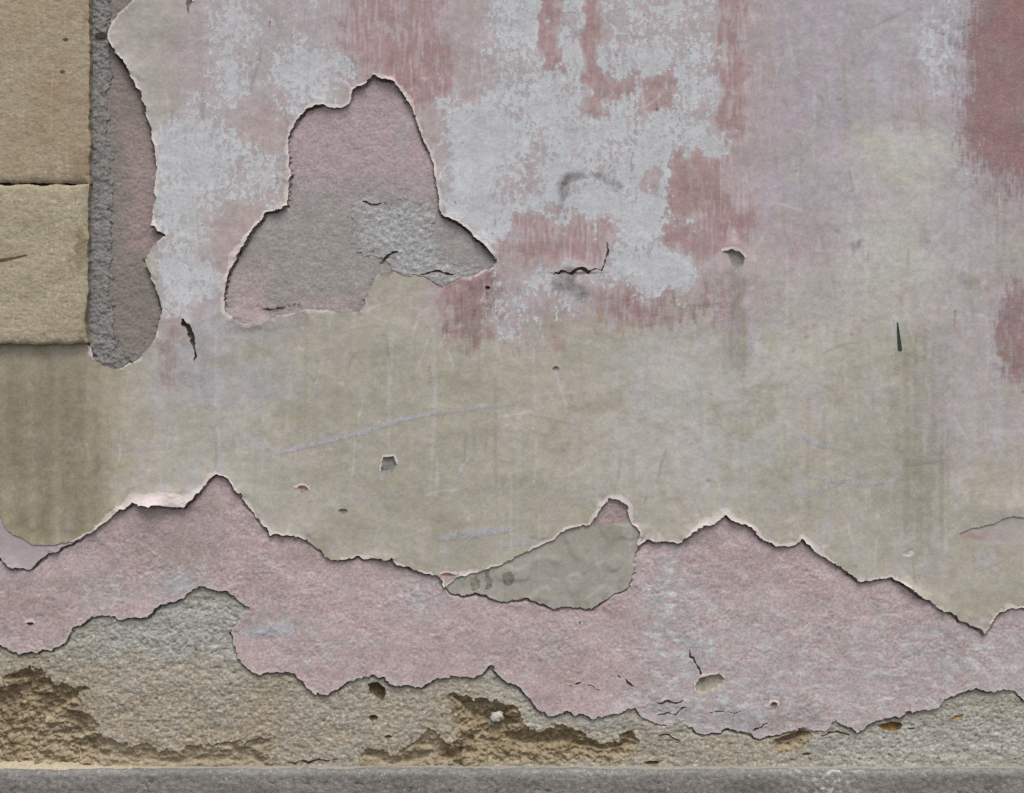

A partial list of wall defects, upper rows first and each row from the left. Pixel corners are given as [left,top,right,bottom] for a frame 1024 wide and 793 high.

peeling [87,0,737,370]
crack [553,243,609,275]
peeling [721,246,748,271]
crack [181,318,197,362]
peeling [379,454,398,473]
flaking render [0,471,1024,767]